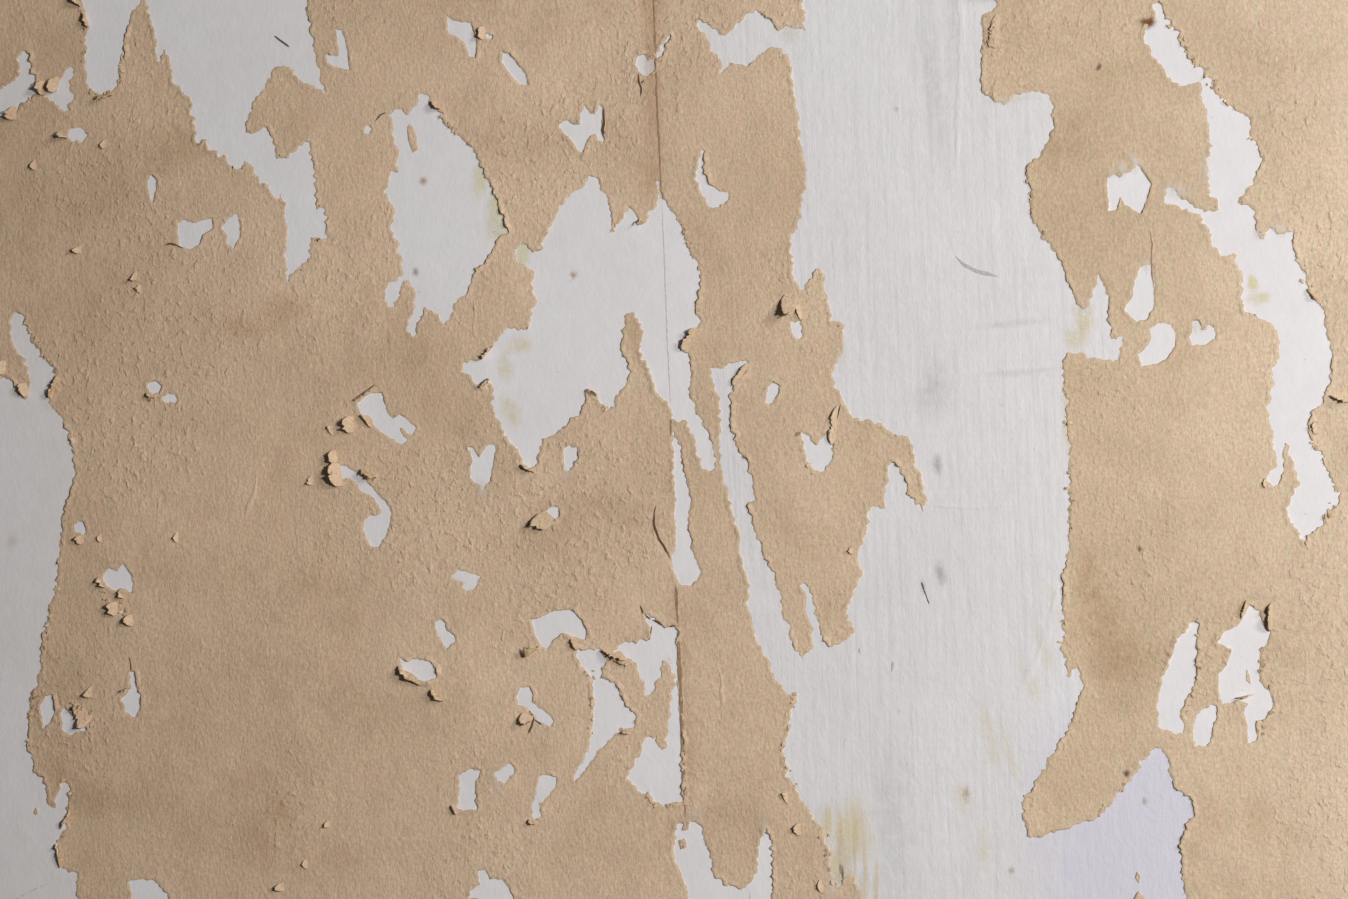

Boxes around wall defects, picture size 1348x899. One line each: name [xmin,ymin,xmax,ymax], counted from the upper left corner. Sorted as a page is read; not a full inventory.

peeling [0,307,94,899]
peeling [0,0,354,285]
peeling [360,0,1278,899]
peeling [1102,0,1345,549]
peeling [125,875,174,899]